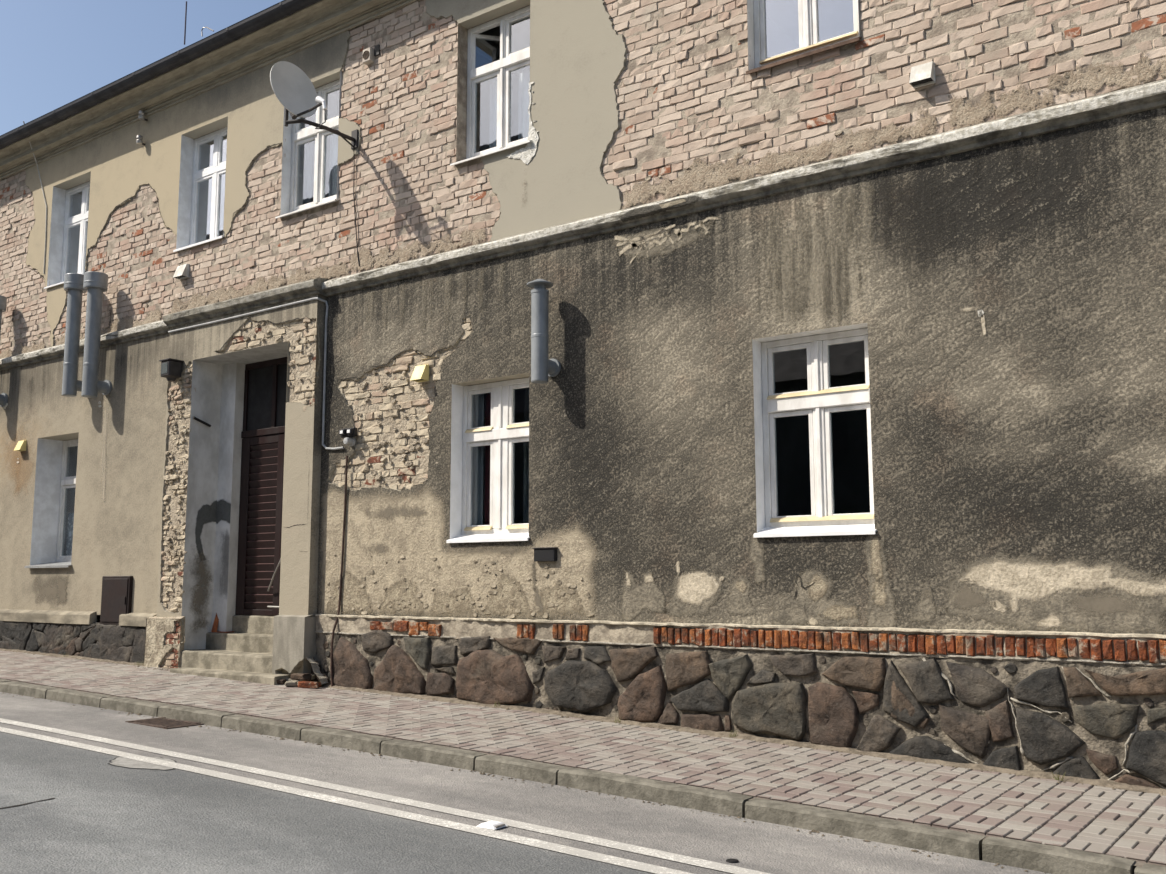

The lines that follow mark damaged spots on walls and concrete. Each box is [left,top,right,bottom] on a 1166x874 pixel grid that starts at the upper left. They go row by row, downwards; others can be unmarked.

spalling [85,0,501,335]
spalling [600,0,1166,210]
spalling [0,170,68,359]
water stain [614,217,718,263]
water stain [758,188,872,322]
spalling [215,317,321,411]
spalling [158,361,196,668]
peeling [318,314,596,619]
flaking render [621,561,756,621]
flaking render [772,569,860,627]
water stain [870,535,887,607]
flaking render [911,551,1166,634]